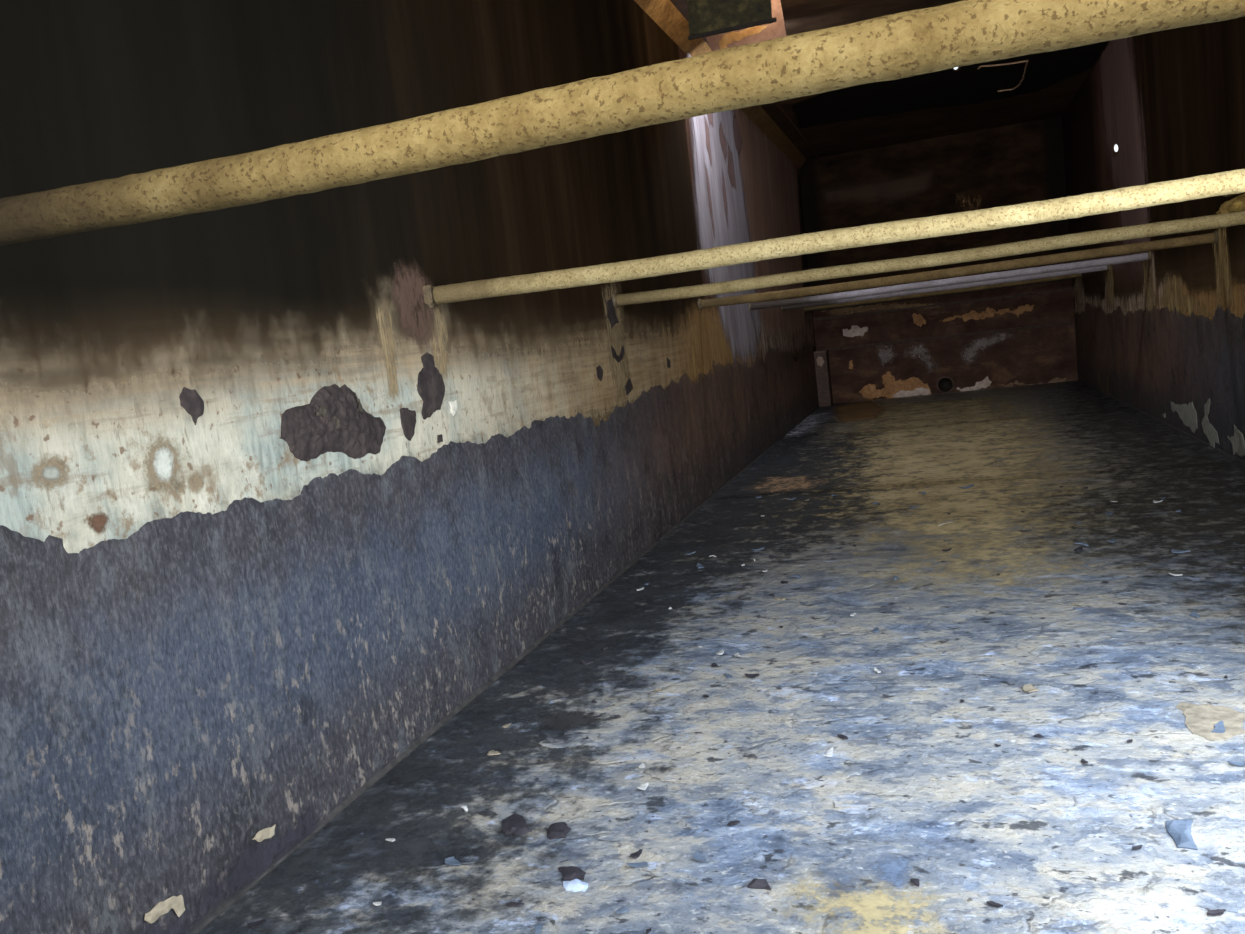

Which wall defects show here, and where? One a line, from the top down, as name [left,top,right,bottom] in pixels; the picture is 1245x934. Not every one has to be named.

leakage [1073,233,1245,321]
peeling [179,387,204,425]
leakage [0,306,815,553]
peeling [399,352,458,441]
peeling [1163,398,1245,457]
leakage [529,711,597,732]